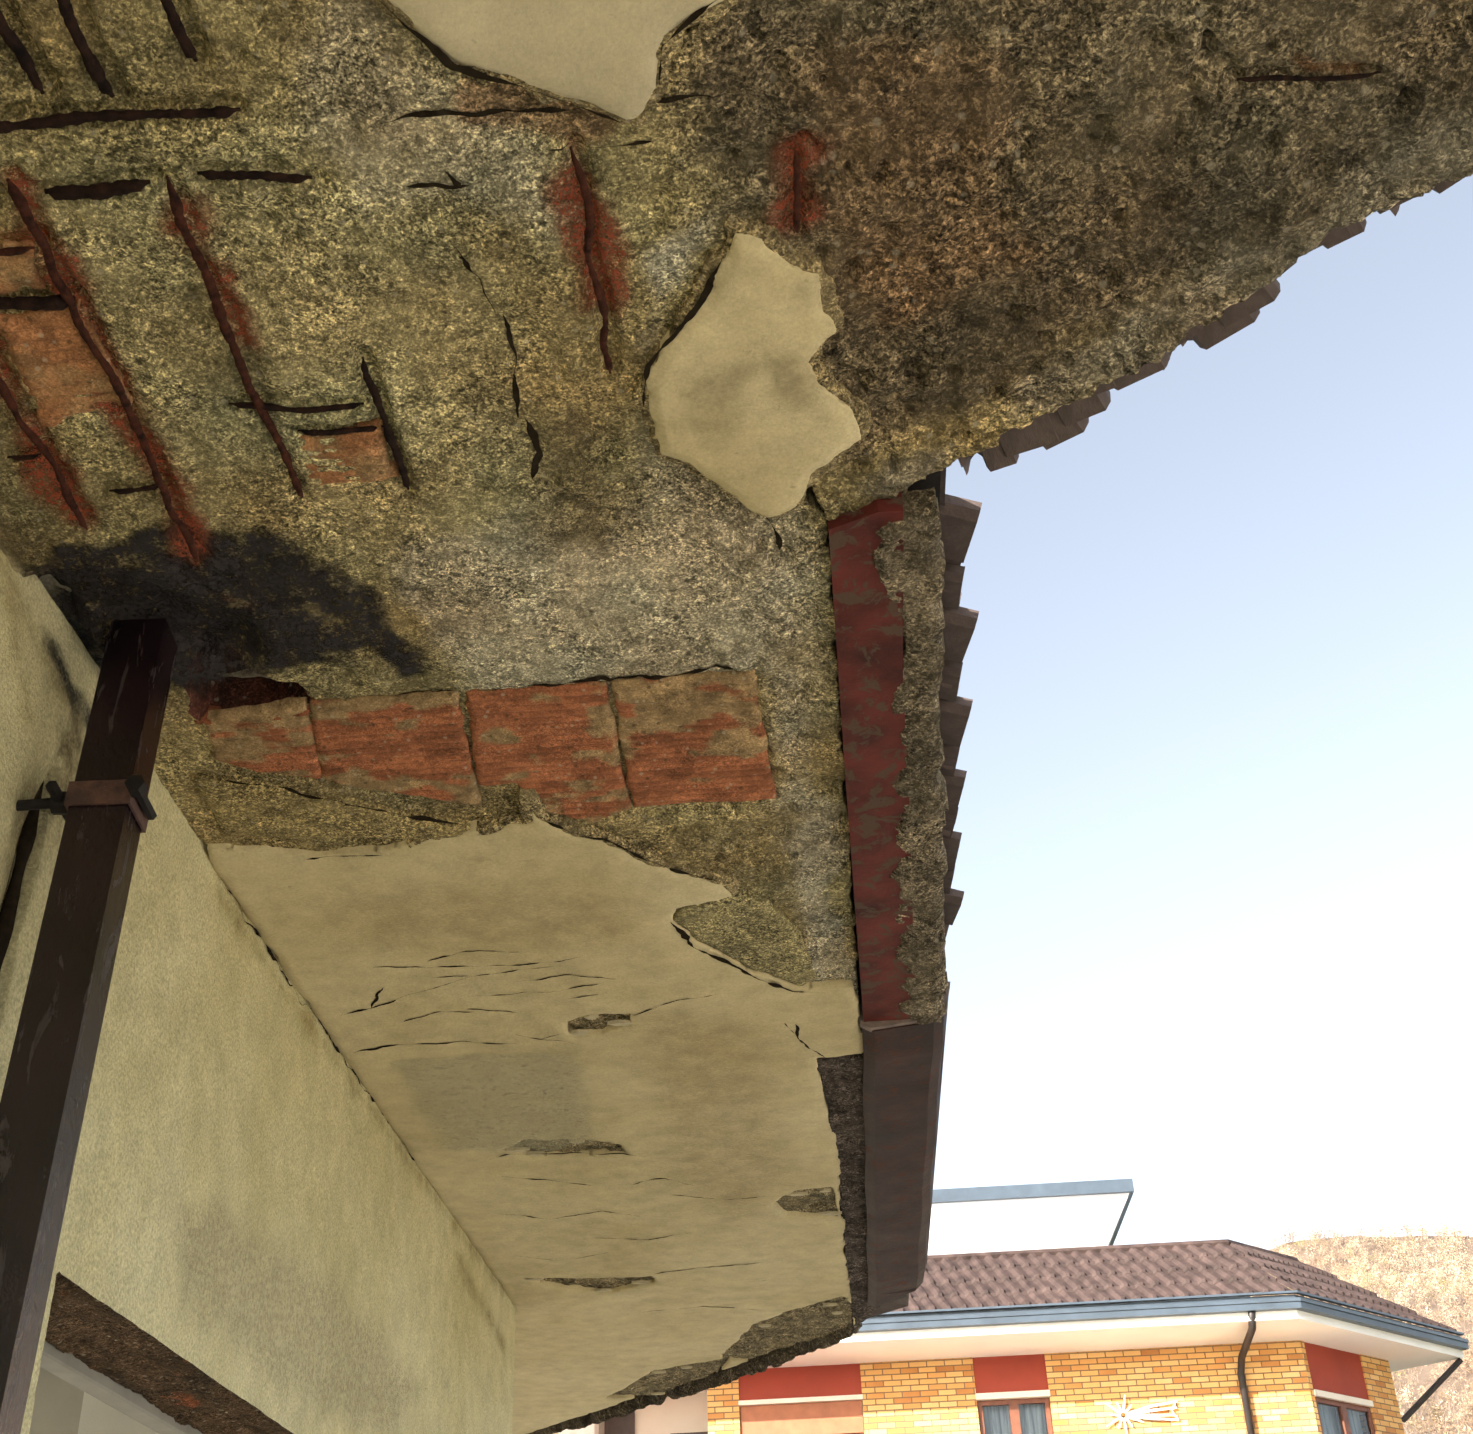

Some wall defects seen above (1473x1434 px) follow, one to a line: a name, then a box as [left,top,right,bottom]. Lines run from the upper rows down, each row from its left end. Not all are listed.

corrosion [164,197,260,347]
corrosion [544,144,629,315]
corrosion [767,131,825,231]
corrosion [0,166,208,561]
crack [456,248,543,479]
spalling [0,0,1473,1000]
damp [48,641,91,725]
damp [0,524,424,695]
crack [215,873,608,1188]
crack [636,922,824,1057]